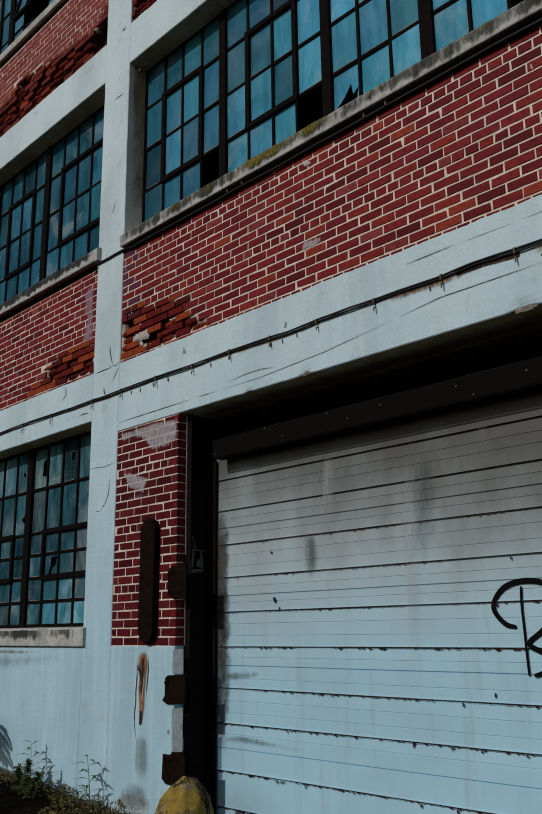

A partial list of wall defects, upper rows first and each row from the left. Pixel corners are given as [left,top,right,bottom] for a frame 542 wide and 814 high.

spalling [133,0,157,20]
spalling [0,42,107,137]
spalling [122,317,206,352]
spalling [44,360,94,381]
rust [134,653,149,738]
rust [247,689,443,702]
rust [218,722,542,758]
rust [218,769,494,814]